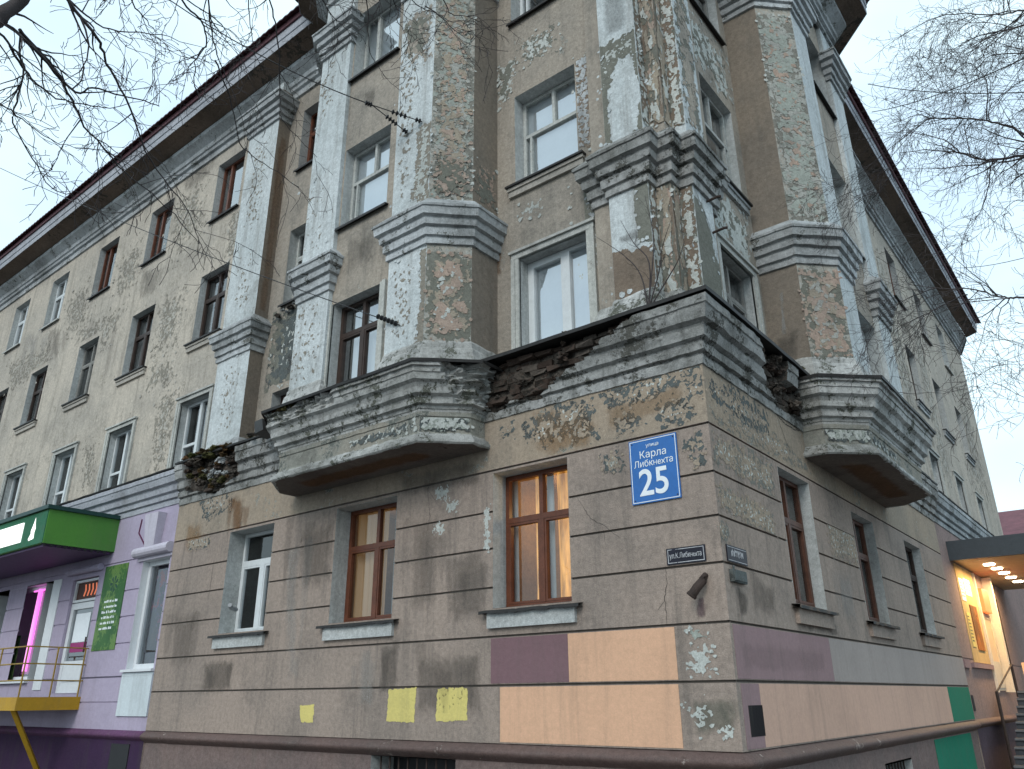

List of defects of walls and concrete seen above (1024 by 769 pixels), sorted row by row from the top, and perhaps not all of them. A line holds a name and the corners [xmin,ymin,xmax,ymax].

peeling [394,0,498,217]
peeling [571,0,734,151]
peeling [755,12,829,223]
peeling [384,244,473,343]
flaking render [567,181,756,300]
peeling [798,267,853,358]
peeling [349,417,474,448]
spalling [483,315,815,553]
spalling [184,442,240,553]
peeling [432,484,459,535]
peeling [684,623,719,679]
peeling [680,694,735,741]